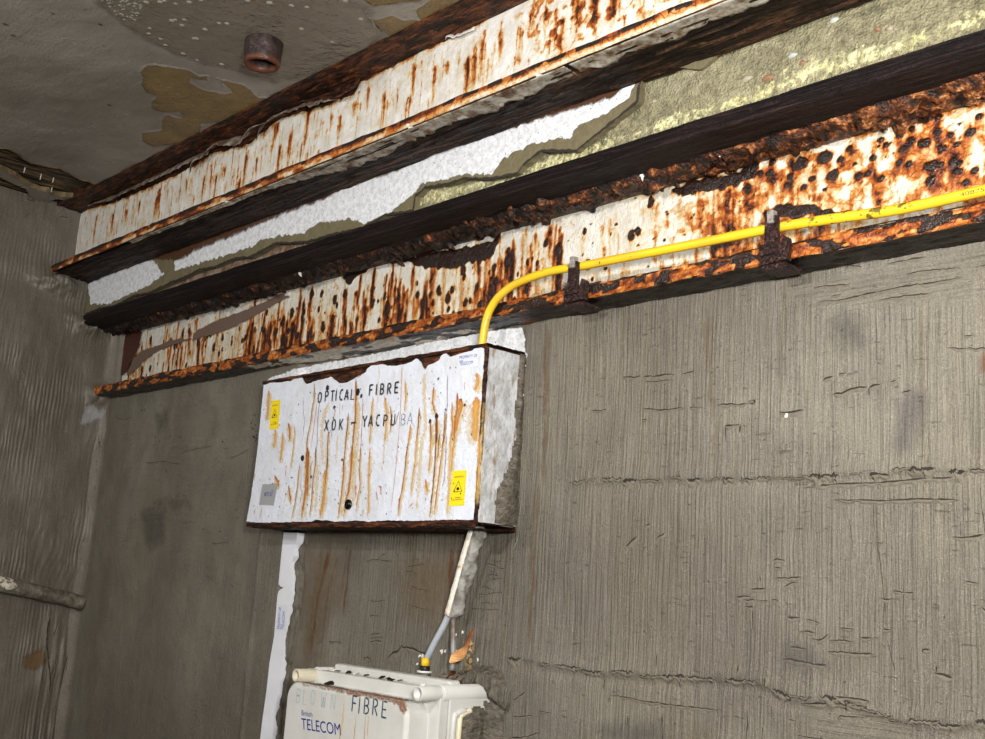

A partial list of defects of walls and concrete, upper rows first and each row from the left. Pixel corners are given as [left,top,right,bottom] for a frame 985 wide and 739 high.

leakage [99,0,381,82]
peeling [361,0,460,37]
spalling [0,148,95,202]
peeling [137,63,271,147]
peeling [88,84,635,305]
corrosion [56,0,872,284]
corrosion [879,117,918,135]
crack [736,505,914,689]
crack [602,673,765,739]
crack [922,648,953,683]